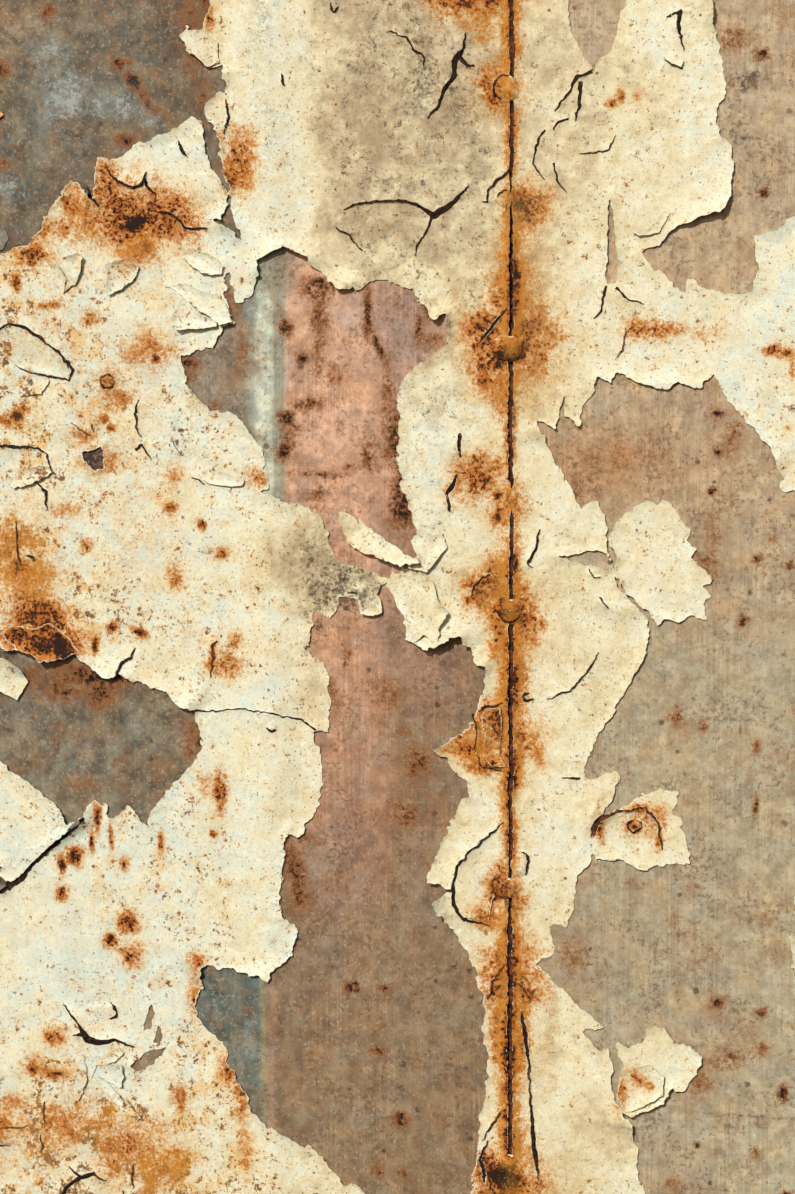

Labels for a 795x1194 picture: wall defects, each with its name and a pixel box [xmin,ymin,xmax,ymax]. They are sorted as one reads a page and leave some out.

crack [388,30,475,118]
peeling [568,0,626,73]
corrosion [10,158,205,293]
crack [335,70,616,256]
peeling [632,0,795,294]
corrosion [0,514,149,710]
peeling [536,373,795,1194]
crack [0,818,85,894]
corrosion [0,1092,190,1194]
crack [63,1004,133,1046]
corrosion [216,1056,253,1181]
crack [487,965,540,1180]